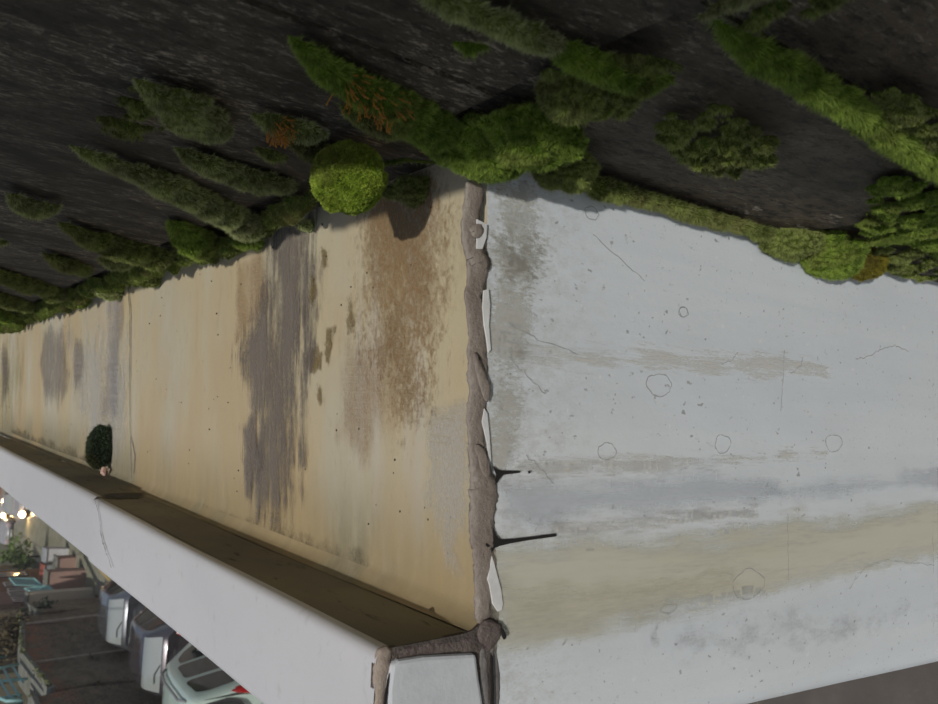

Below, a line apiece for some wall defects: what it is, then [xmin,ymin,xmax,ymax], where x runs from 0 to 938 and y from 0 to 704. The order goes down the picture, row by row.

water stain [1,349,9,399]
water stain [40,302,123,445]
water stain [239,208,317,528]